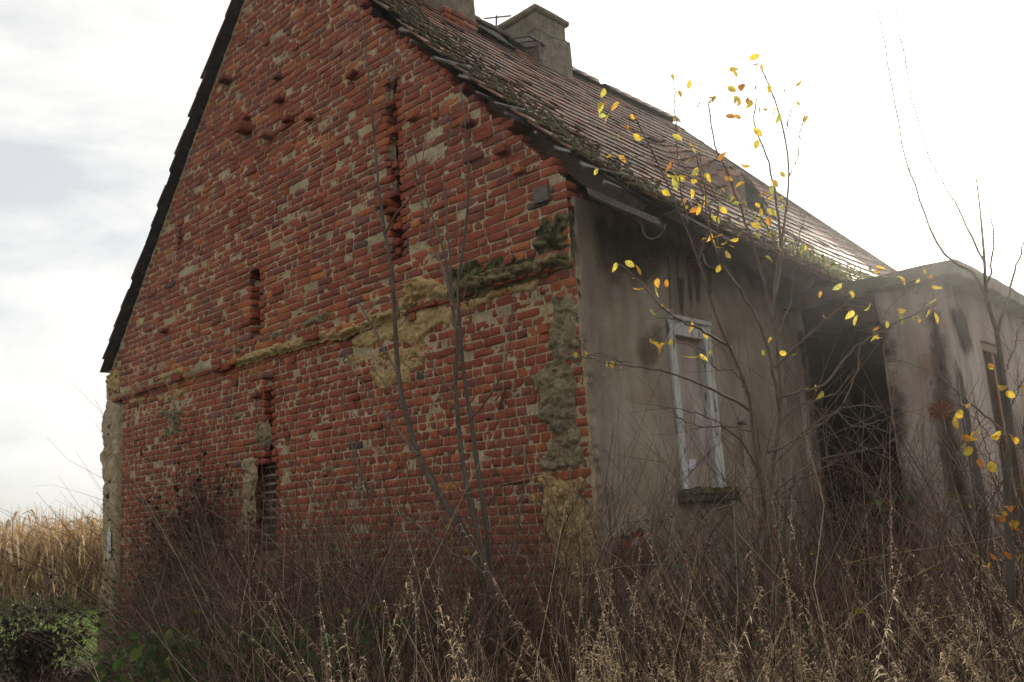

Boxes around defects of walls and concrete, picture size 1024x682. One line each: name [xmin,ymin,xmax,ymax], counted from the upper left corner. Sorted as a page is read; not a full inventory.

spalling [105,370,120,394]
spalling [349,279,539,390]
leakage [928,308,1005,652]